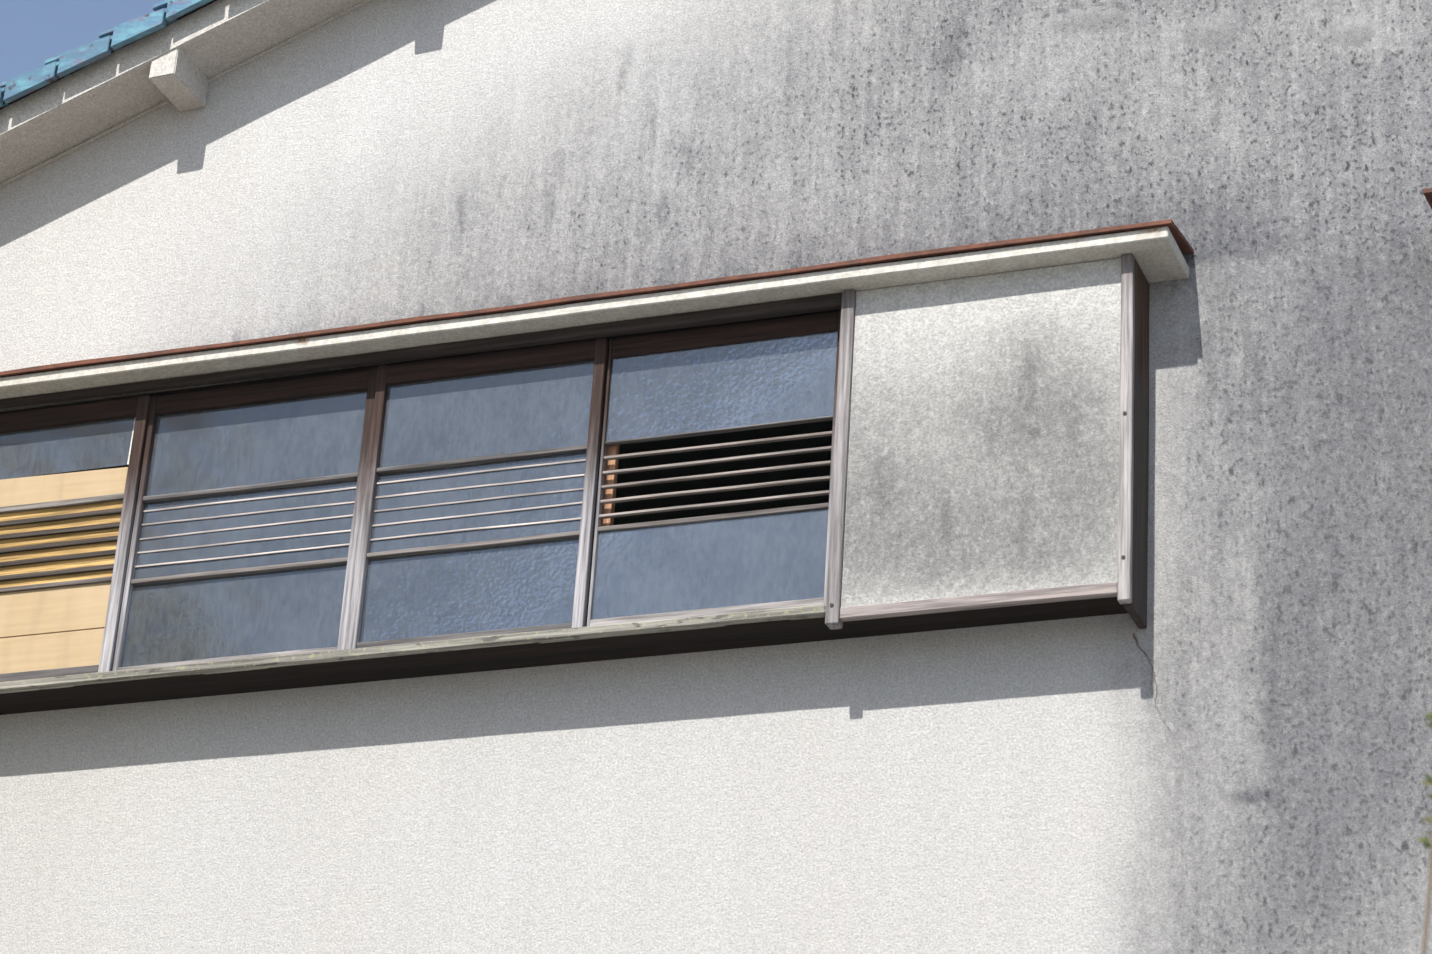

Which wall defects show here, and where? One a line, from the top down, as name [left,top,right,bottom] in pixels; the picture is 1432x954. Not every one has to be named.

water stain [454,0,1432,954]
crack [1133,633,1157,707]